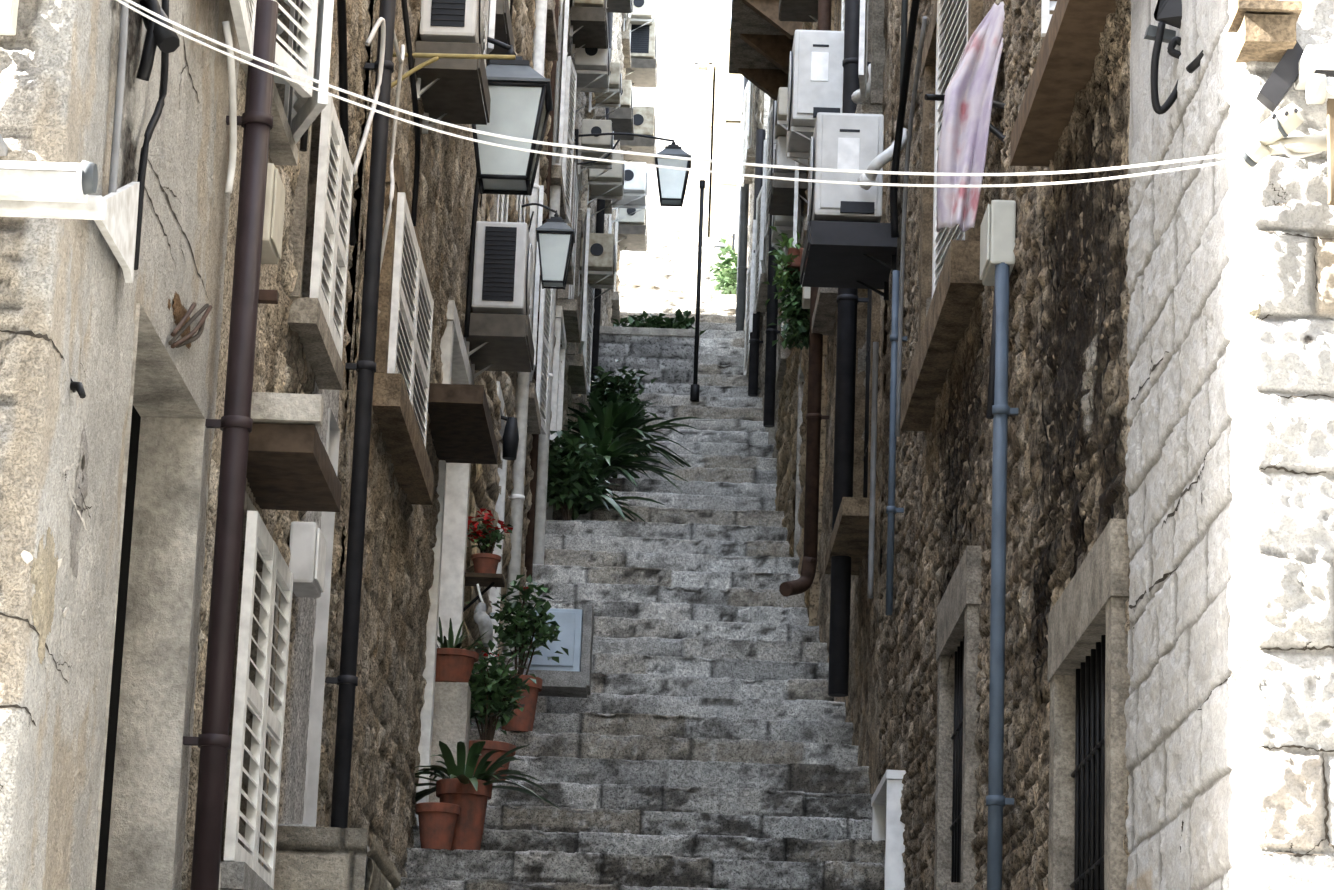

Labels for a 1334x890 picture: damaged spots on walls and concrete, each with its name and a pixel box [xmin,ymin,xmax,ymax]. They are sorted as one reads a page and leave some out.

crack [0,330,87,385]
water stain [1029,39,1127,678]
crack [0,612,72,683]
crack [0,704,36,732]
crack [1258,745,1334,857]